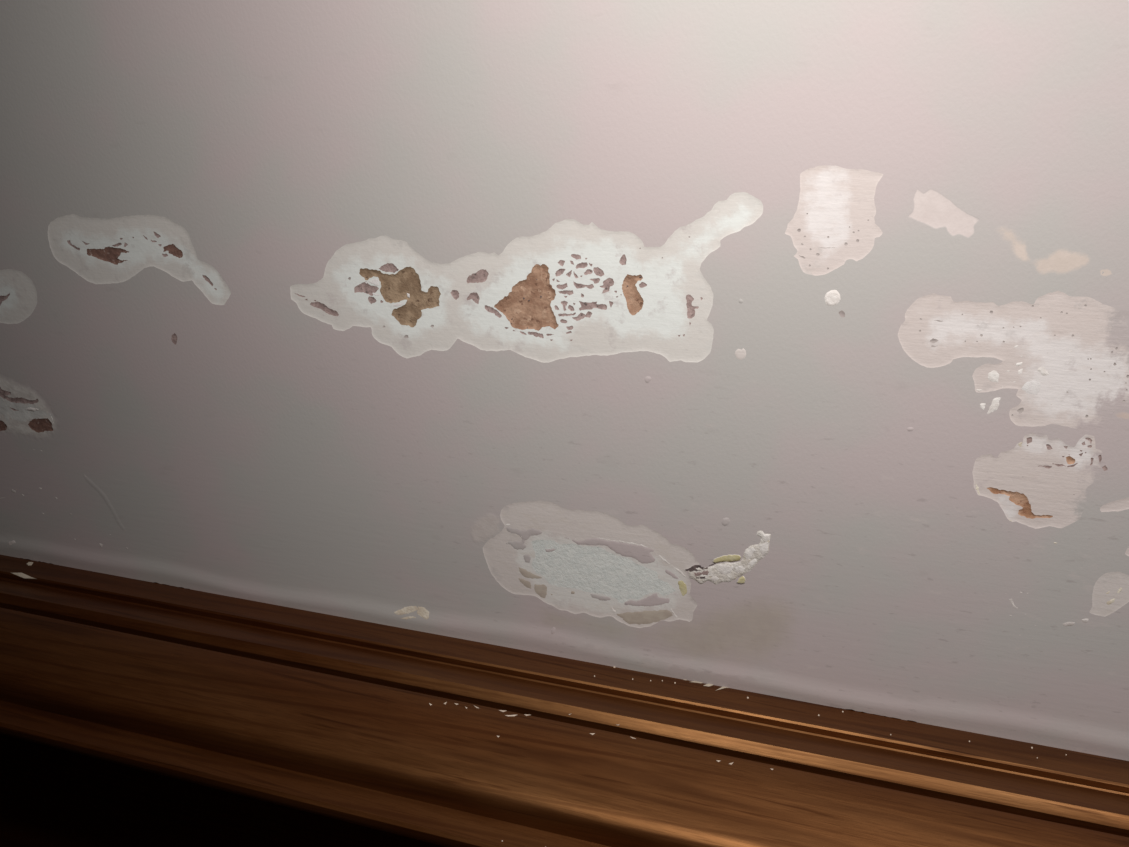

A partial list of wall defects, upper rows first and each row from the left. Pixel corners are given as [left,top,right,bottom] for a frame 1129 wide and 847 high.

peeling [0,269,37,324]
peeling [48,214,231,305]
peeling [290,192,763,363]
peeling [785,165,883,276]
peeling [907,188,980,238]
flaking render [0,371,61,443]
peeling [898,291,1129,529]
peeling [483,500,771,628]
peeling [1062,572,1129,626]